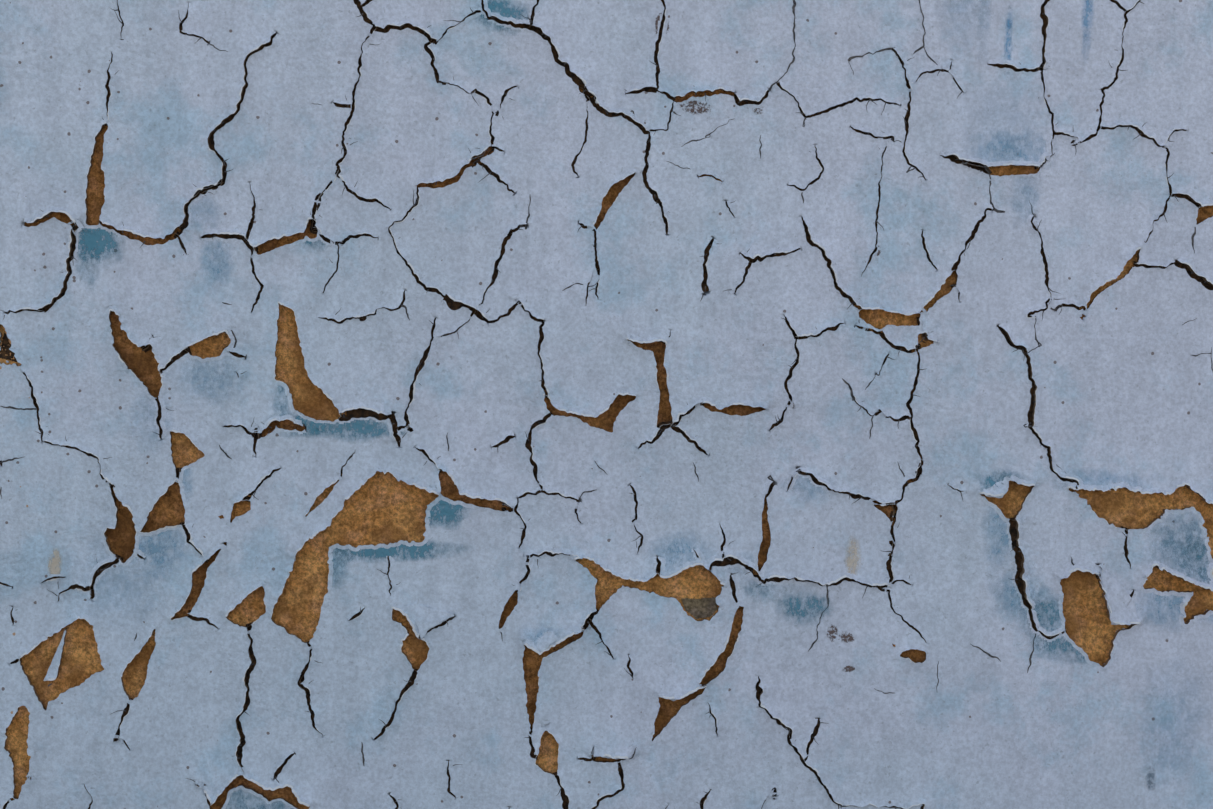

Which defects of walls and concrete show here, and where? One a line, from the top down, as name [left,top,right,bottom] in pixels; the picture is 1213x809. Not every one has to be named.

crack [1,0,280,379]
crack [309,0,1213,555]
crack [0,554,123,626]
peeling [0,298,514,809]
crack [221,414,307,457]
crack [231,622,327,783]
crack [551,759,629,809]
peeling [494,546,749,779]
peeling [753,475,778,575]
crack [706,312,939,689]
crack [751,676,929,809]
peeling [946,475,1213,672]